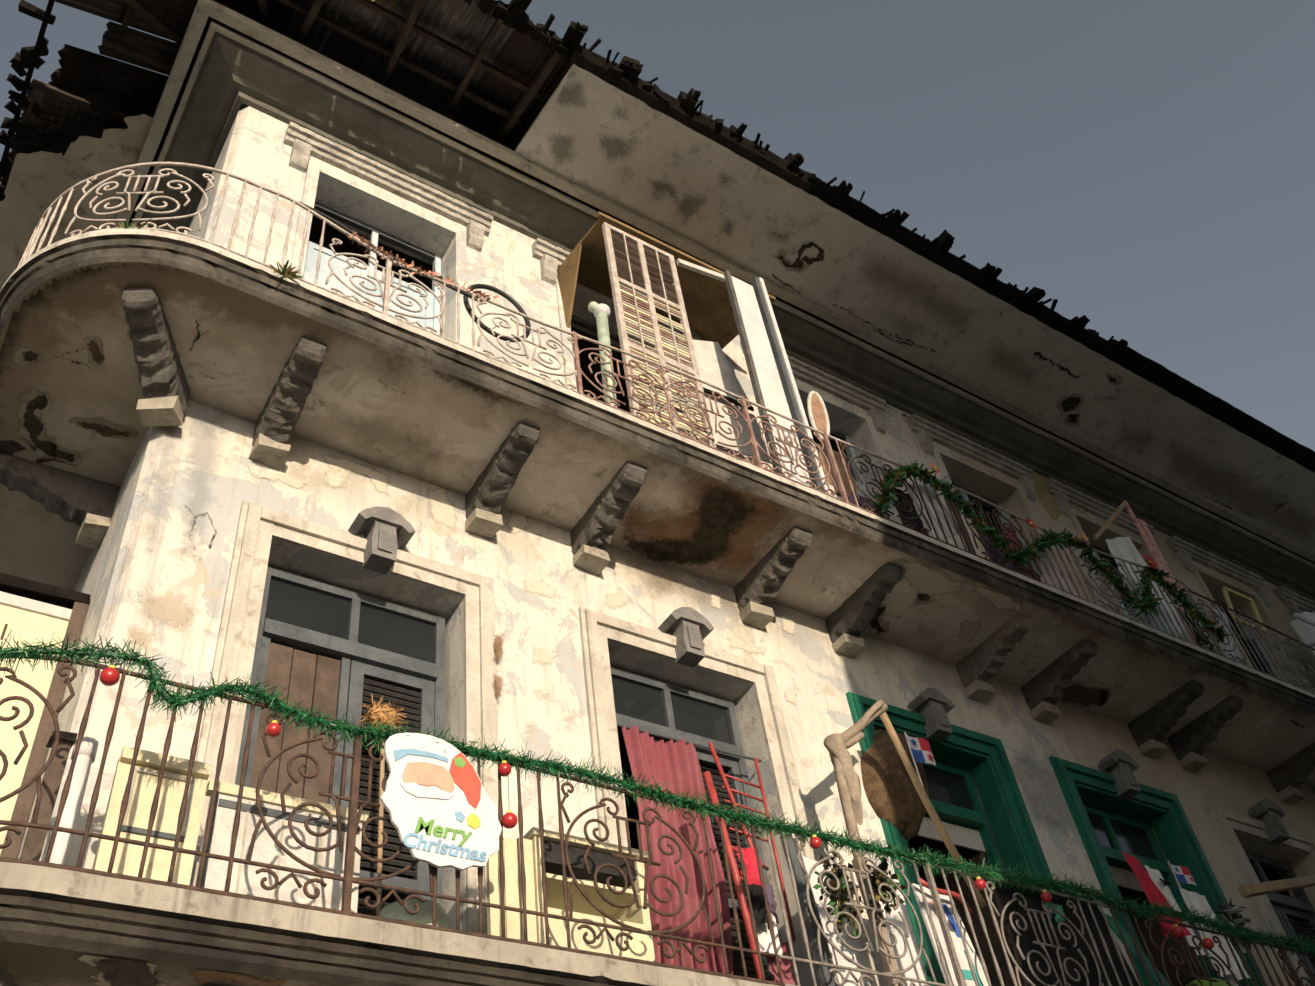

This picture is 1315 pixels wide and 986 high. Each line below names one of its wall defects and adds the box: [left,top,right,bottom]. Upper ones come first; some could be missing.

spalling [12,337,105,372]
spalling [0,389,82,465]
spalling [69,417,138,441]
spalling [1056,394,1084,427]
peeling [249,466,307,488]
peeling [323,455,389,494]
water stain [624,485,755,565]
spalling [1062,681,1113,709]
spalling [78,955,160,986]